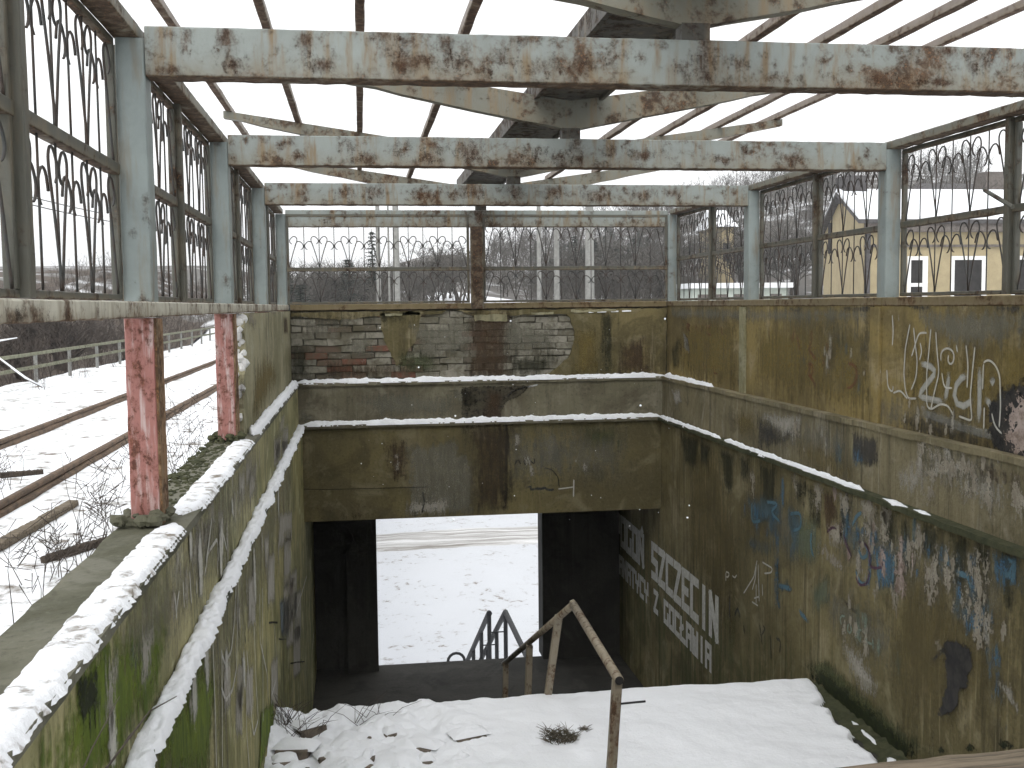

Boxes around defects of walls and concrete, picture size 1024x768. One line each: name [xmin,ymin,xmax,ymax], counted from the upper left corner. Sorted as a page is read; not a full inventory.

corrosion [217,28,238,74]
corrosion [297,33,331,70]
corrosion [373,32,430,71]
corrosion [440,38,514,74]
corrosion [675,40,716,83]
corrosion [866,73,951,86]
corrosion [522,139,583,166]
spalling [290,309,616,418]
peeling [903,377,1024,531]
peeling [813,482,1009,652]